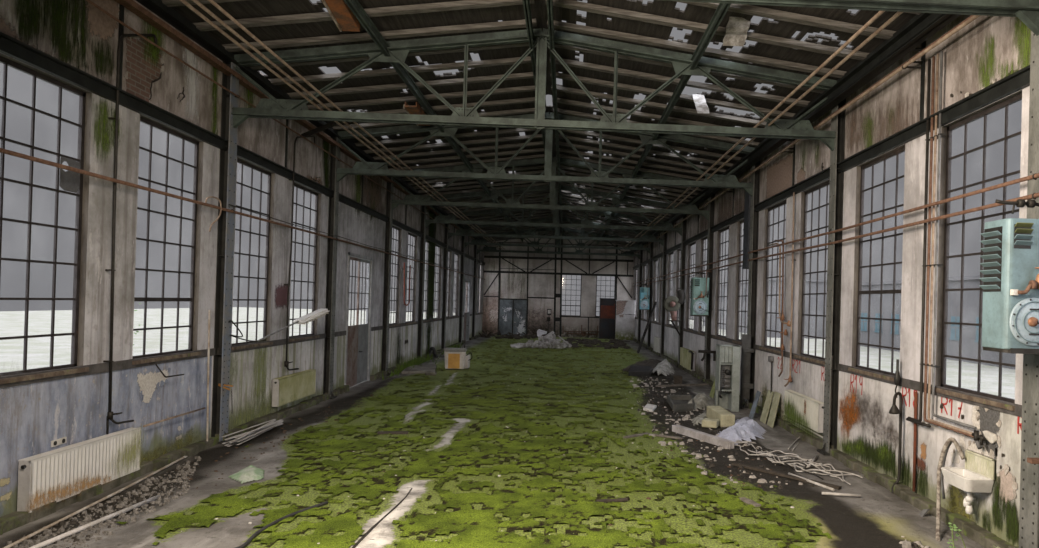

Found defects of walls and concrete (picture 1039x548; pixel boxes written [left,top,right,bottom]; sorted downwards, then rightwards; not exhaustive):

peeling [137,368,171,403]
corrosion [28,477,110,509]